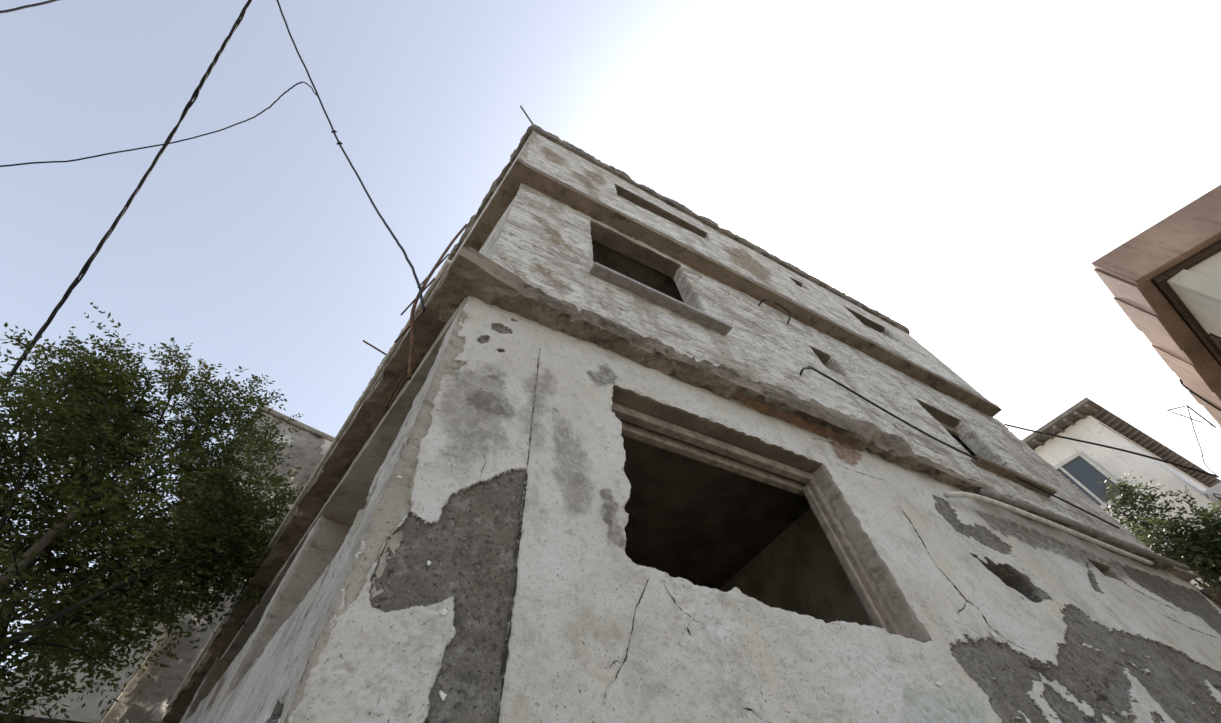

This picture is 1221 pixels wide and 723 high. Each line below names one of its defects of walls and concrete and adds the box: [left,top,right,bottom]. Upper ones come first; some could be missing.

flaking render [517,189,596,234]
flaking render [681,266,771,334]
flaking render [439,318,517,382]
flaking render [345,397,526,723]
crack [903,511,1035,655]
flaking render [933,495,1012,555]
flaking render [1086,563,1104,594]
flaking render [1122,565,1221,635]
crack [602,579,699,705]
flaking render [950,588,1221,723]